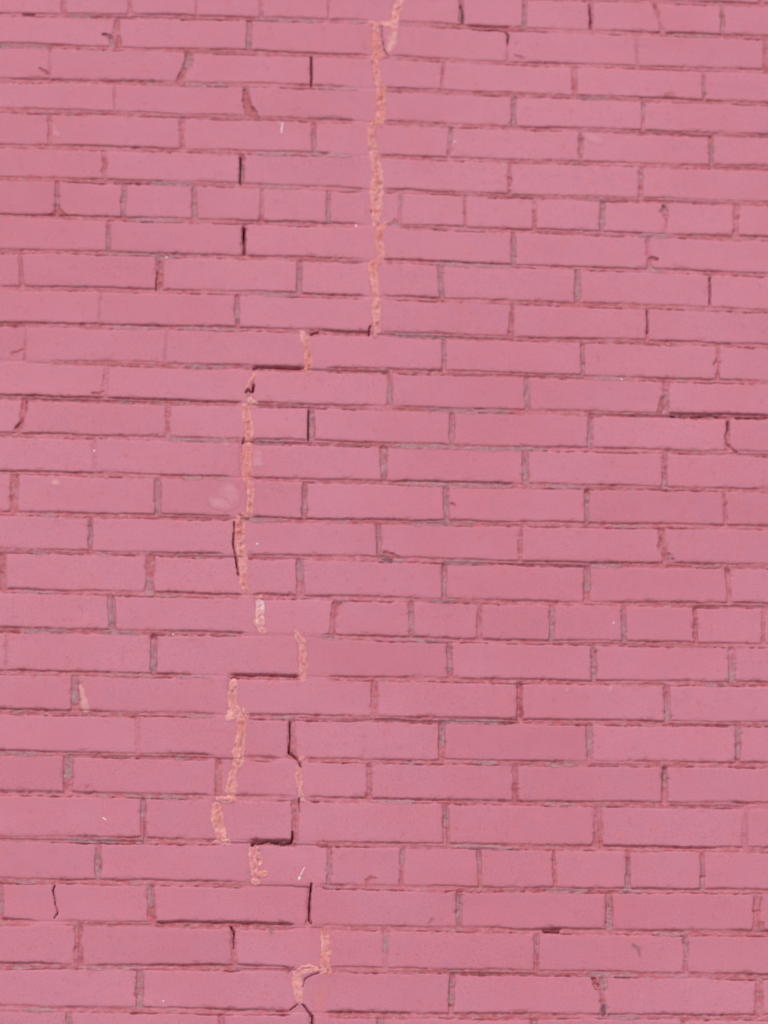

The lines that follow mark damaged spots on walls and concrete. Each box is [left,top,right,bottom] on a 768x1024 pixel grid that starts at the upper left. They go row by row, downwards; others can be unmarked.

crack [366,0,405,339]
crack [299,330,313,375]
crack [232,371,267,635]
crack [293,630,309,683]
crack [211,677,269,887]
crack [288,727,306,804]
crack [290,888,333,1024]